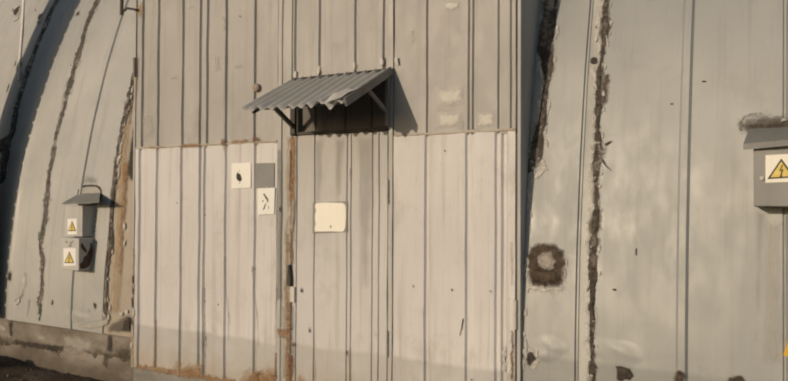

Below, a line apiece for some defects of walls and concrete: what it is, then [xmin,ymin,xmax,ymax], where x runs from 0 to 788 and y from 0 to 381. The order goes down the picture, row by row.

crack [77,185,102,201]
peeling [526,160,548,234]
peeling [524,254,562,293]
rust [136,365,236,381]
rust [249,354,277,381]
rust [277,303,295,381]
peeling [502,331,539,379]